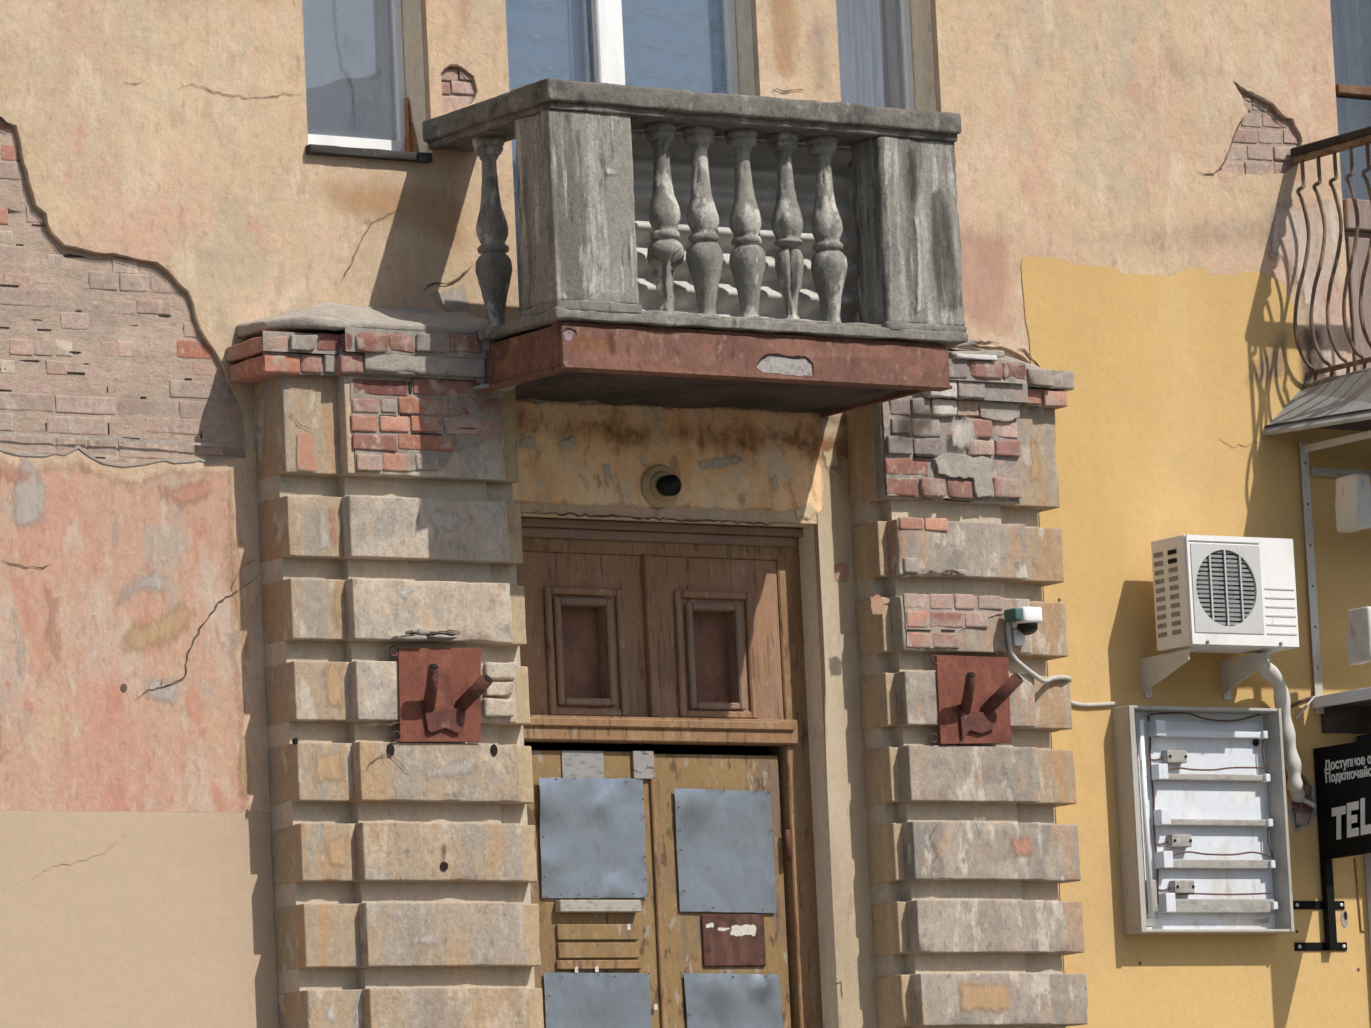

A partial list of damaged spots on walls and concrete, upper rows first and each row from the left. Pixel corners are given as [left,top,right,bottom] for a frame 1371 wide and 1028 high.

crack [182,83,302,99]
spalling [441,64,476,113]
spalling [1200,81,1299,176]
crack [343,209,400,278]
peeling [0,116,248,813]
spalling [350,377,503,472]
spalling [873,393,1040,532]
crack [1,560,53,569]
crack [135,560,262,700]